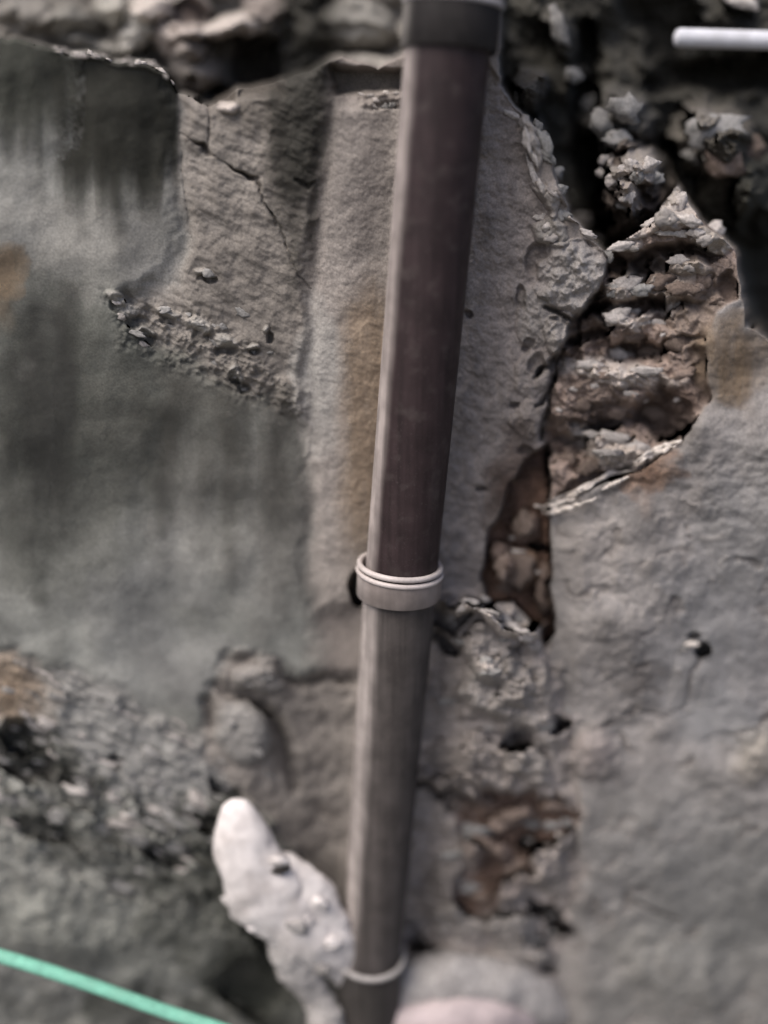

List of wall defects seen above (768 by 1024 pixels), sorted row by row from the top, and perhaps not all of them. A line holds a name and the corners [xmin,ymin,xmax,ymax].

leakage [0,38,177,199]
crack [179,106,312,290]
spalling [104,291,307,416]
spalling [441,0,768,677]
spalling [438,790,581,916]